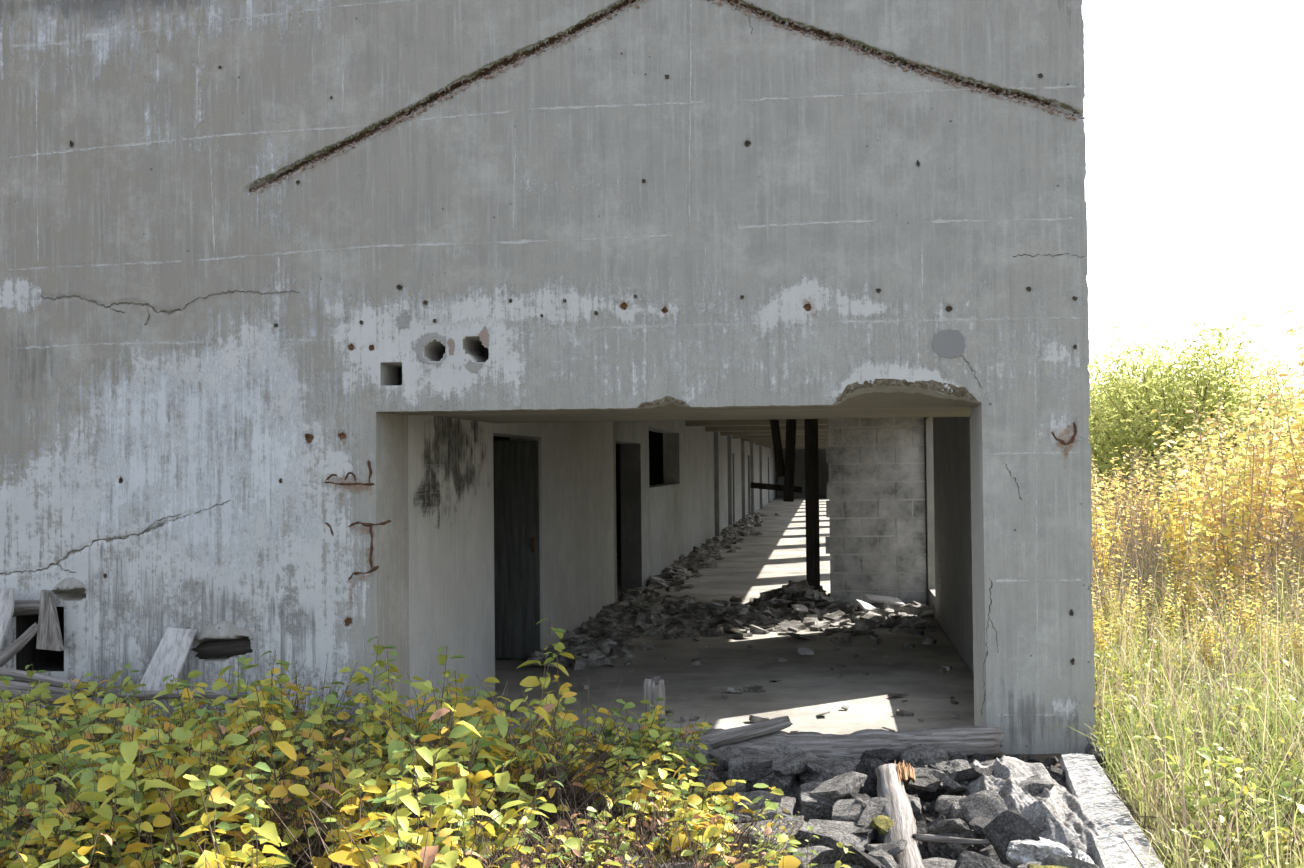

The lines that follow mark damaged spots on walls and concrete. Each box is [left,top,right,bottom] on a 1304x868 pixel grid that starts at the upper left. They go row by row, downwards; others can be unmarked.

crack [41,290,301,325]
spalling [827,361,978,404]
crack [0,500,230,575]
water stain [0,257,1084,750]